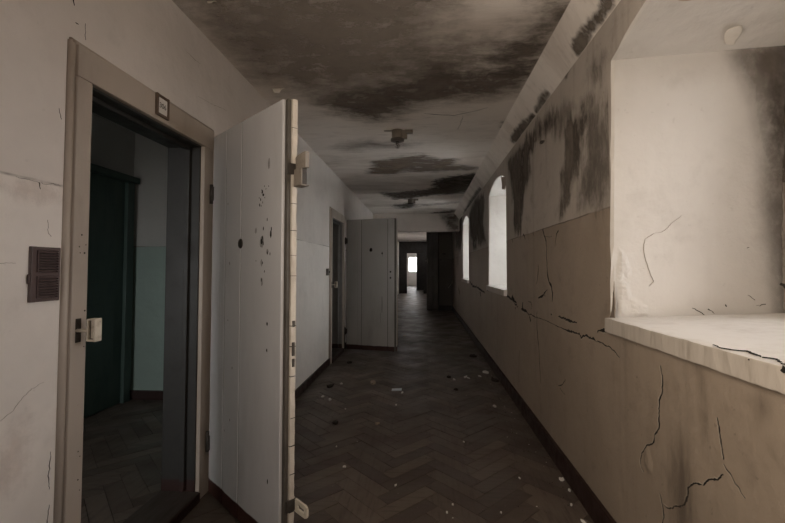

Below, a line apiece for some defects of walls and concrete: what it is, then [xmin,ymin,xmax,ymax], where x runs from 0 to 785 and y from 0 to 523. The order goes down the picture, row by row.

water stain [572,0,614,55]
water stain [369,155,485,250]
water stain [508,92,555,235]
crack [458,230,620,391]
water stain [560,112,610,219]
flaking render [596,246,650,335]
crack [643,216,681,286]
crack [713,344,785,365]
water stain [742,48,785,275]
crack [639,365,663,472]
crack [659,417,745,523]